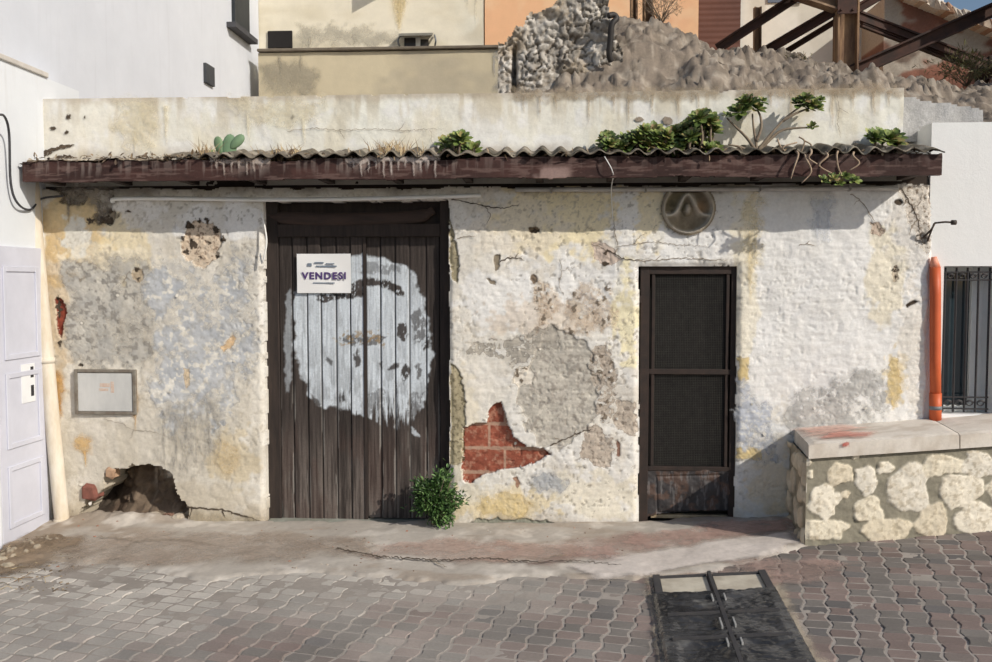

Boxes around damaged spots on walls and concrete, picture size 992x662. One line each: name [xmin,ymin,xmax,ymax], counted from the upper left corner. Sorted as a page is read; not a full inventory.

crack [902,189,923,234]
spalling [591,241,620,266]
peeling [55,218,261,435]
peeling [449,274,639,488]
peeling [734,378,778,463]
peeling [784,370,890,436]
hole [79,464,189,519]
crack [98,506,260,551]
crack [336,547,617,567]